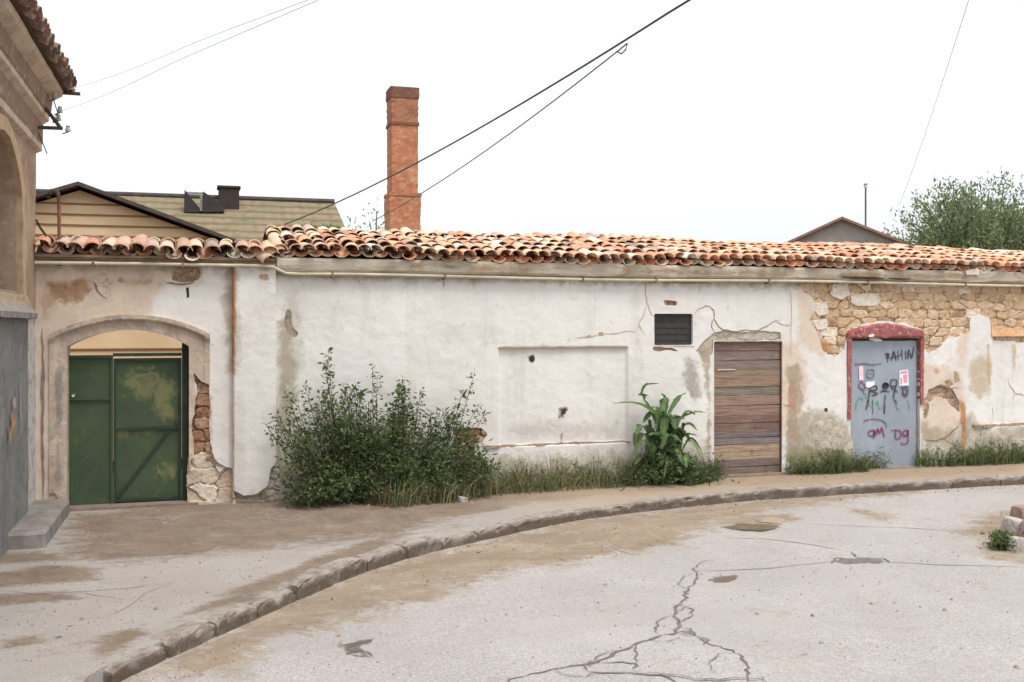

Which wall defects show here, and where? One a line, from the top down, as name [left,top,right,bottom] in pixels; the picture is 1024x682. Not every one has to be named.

spalling [172,266,201,283]
spalling [284,309,298,337]
crack [578,282,792,355]
spalling [619,268,1024,357]
spalling [186,374,280,503]
damp [684,345,710,397]
damp [787,364,803,460]
spalling [923,369,960,419]